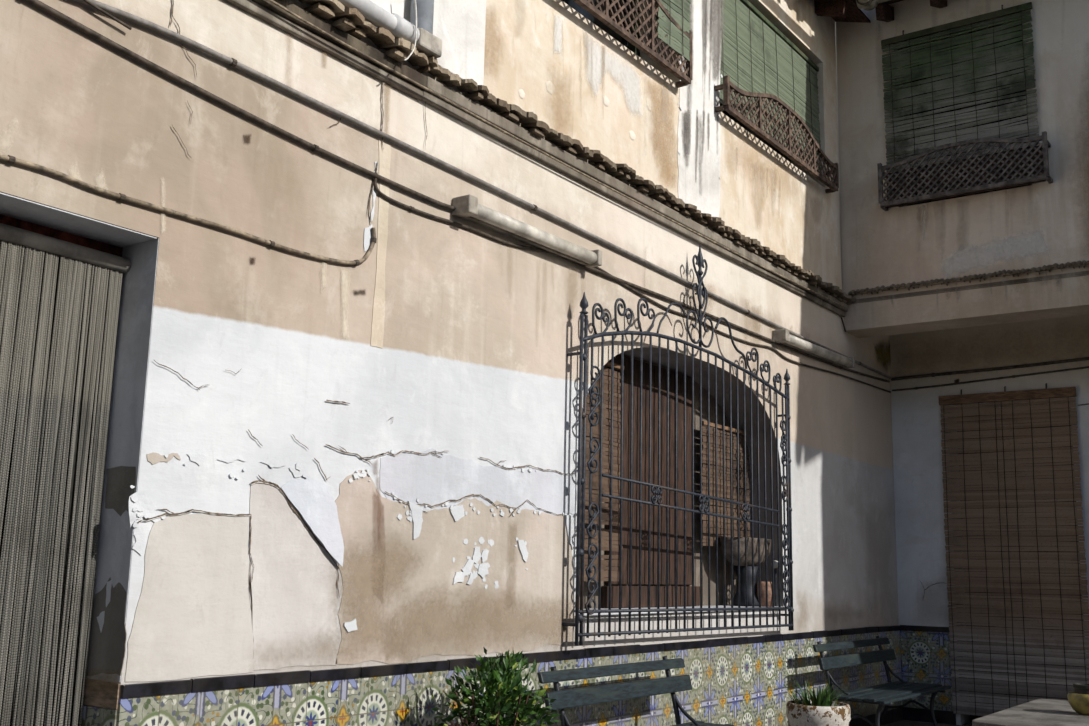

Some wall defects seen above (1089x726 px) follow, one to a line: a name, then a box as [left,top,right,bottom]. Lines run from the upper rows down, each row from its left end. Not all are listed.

damp [683,0,723,90]
flaking render [84,448,577,682]